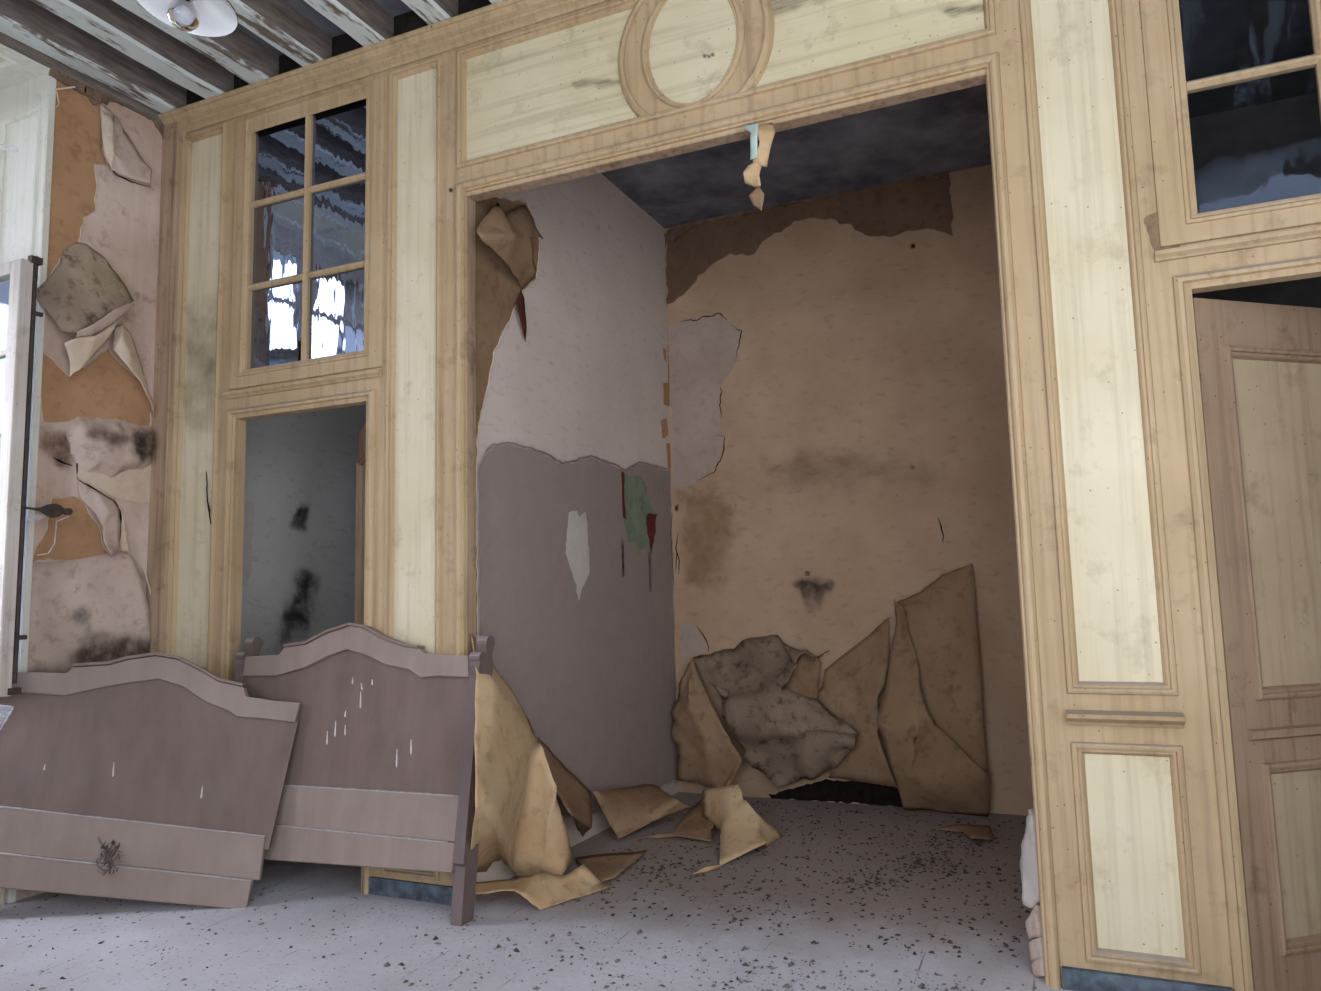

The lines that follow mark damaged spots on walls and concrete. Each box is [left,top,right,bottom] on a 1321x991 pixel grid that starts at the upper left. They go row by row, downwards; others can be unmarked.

flaking render [142,114,165,141]
peeling [37,68,155,427]
peeling [477,202,544,289]
peeling [664,171,953,304]
peeling [661,383,671,469]
peeling [33,480,129,563]
peeling [646,513,657,552]
water stain [798,571,828,596]